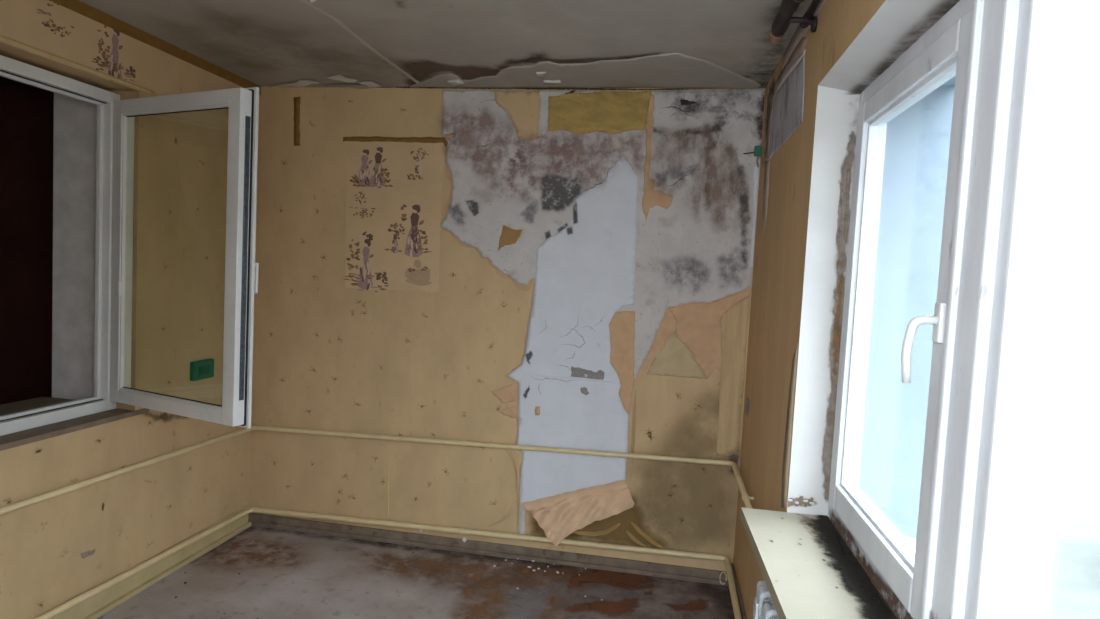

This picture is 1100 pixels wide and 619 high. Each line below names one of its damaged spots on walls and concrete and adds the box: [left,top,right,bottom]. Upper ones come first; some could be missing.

peeling [273,75,395,89]
damp [446,113,640,238]
flaking render [410,53,765,380]
damp [654,122,749,279]
damp [744,70,781,155]
damp [822,132,856,500]
flaking render [571,352,629,480]
damp [803,515,896,619]